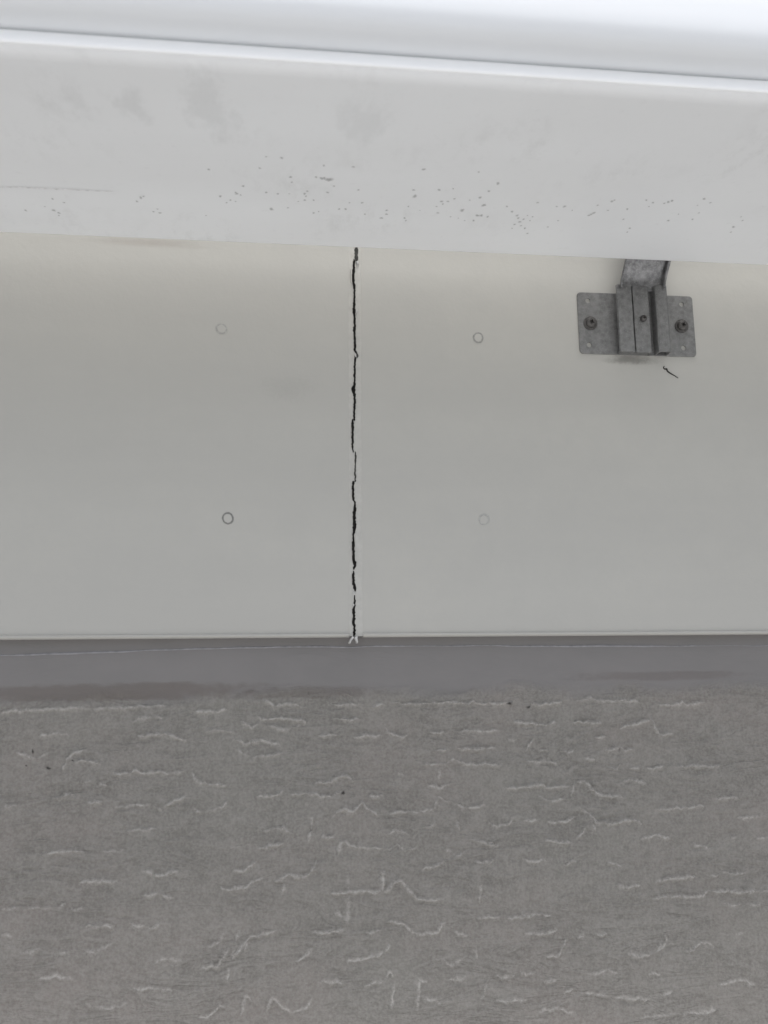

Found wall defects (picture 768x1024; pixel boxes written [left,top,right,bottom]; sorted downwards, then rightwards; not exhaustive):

crack [348,247,359,644]